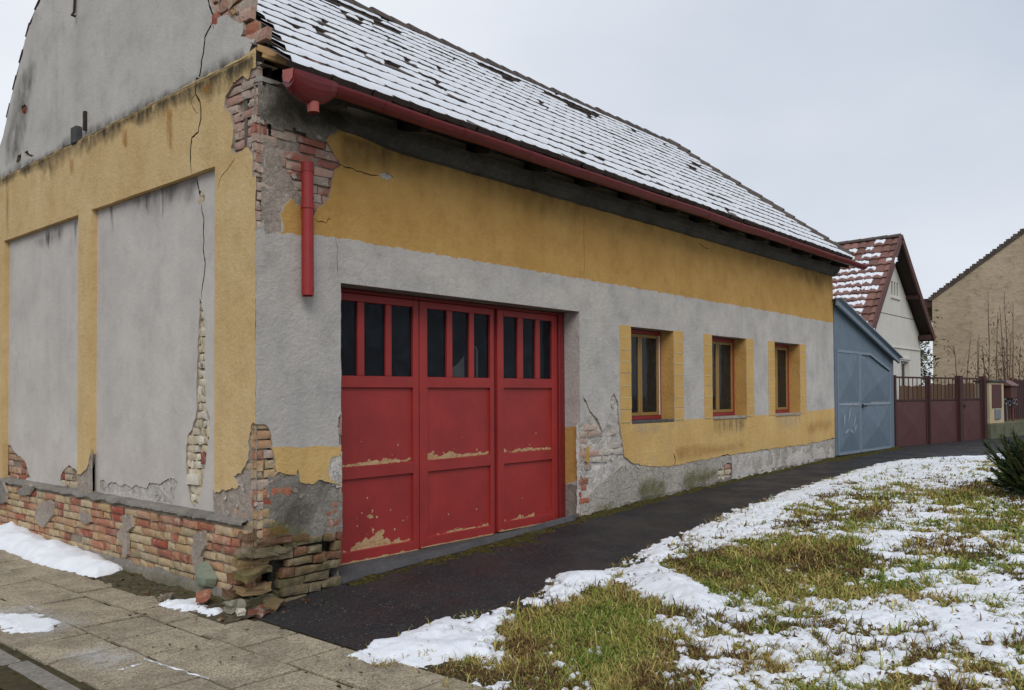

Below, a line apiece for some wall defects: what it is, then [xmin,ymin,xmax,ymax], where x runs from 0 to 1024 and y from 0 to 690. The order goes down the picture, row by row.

spalling [211,0,272,46]
leakage [81,57,252,146]
leakage [2,144,65,182]
crack [190,0,234,303]
spalling [227,65,339,234]
spalling [8,445,30,480]
spalling [61,466,77,488]
peeling [101,303,551,565]
spalling [576,394,640,514]